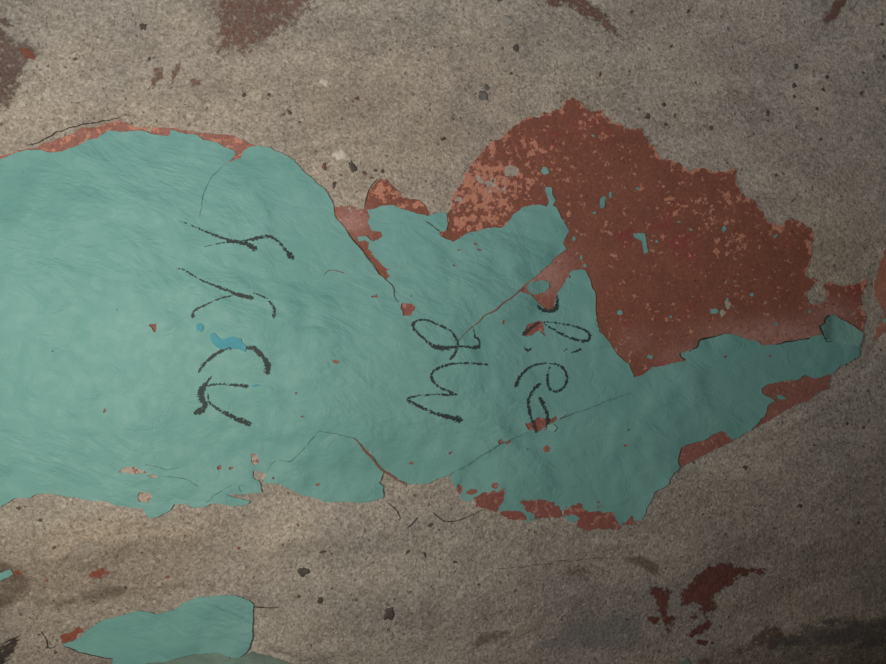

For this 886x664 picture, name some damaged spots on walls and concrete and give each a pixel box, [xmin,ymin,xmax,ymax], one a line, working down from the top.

crack [30,118,117,145]
peeling [0,98,886,531]